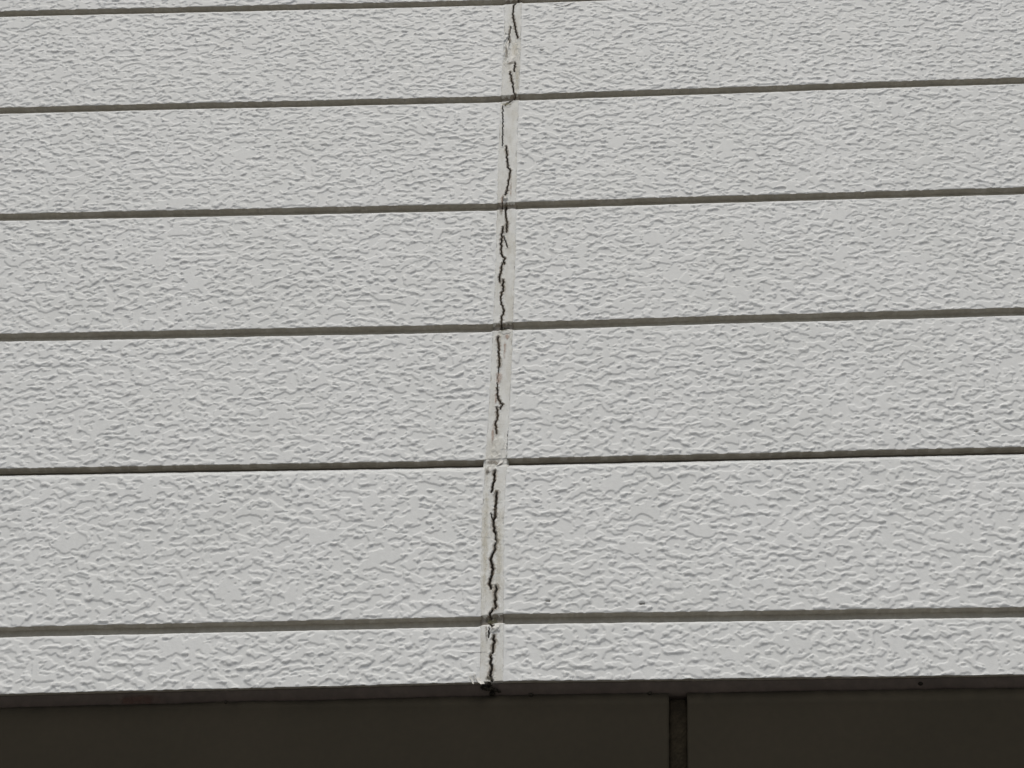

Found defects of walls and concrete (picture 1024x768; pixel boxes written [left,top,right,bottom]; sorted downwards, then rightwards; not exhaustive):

crack [494,0,519,434]
crack [465,470,499,682]